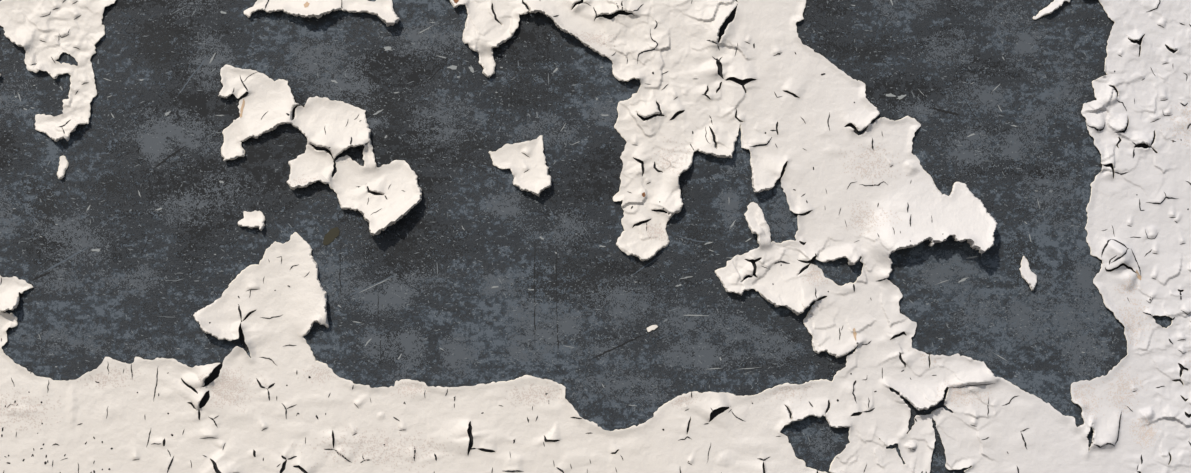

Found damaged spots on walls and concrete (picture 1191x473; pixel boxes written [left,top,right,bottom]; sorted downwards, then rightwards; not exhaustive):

peeling [1126,29,1144,45]
peeling [1134,99,1173,145]
peeling [0,0,858,431]
peeling [796,0,1128,473]
crack [107,256,369,473]
crack [393,389,623,473]
crack [757,326,936,473]